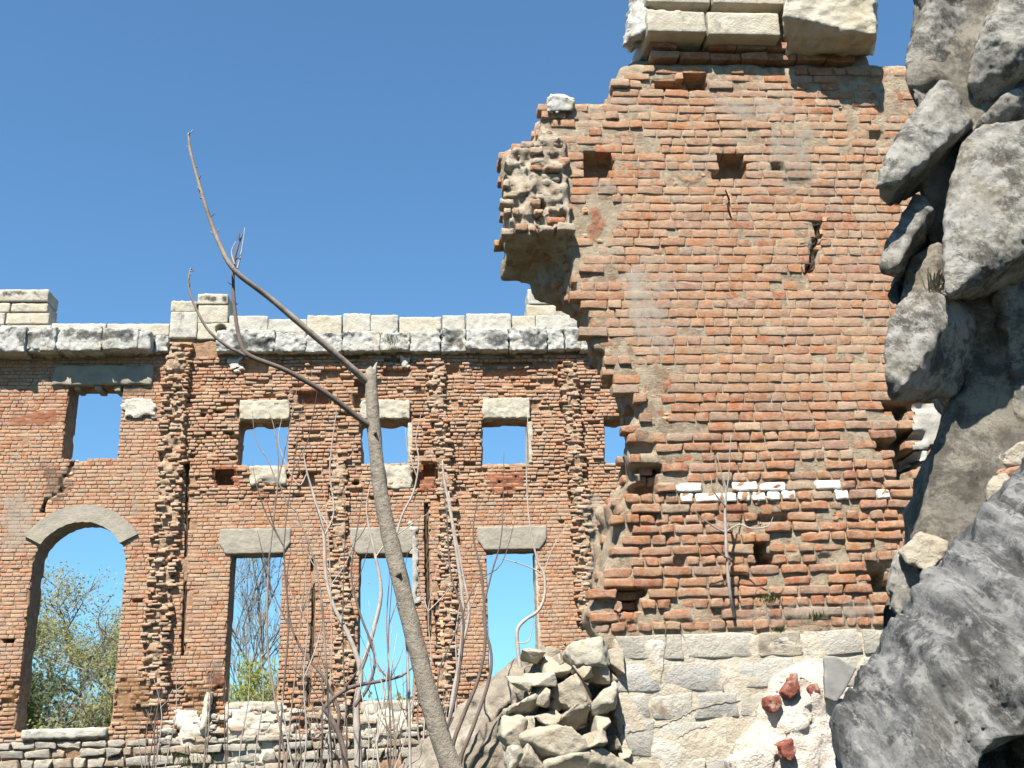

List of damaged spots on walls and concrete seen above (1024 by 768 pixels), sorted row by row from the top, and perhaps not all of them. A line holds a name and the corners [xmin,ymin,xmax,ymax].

crack [712,189,746,219]
crack [797,217,829,273]
crack [180,463,193,653]